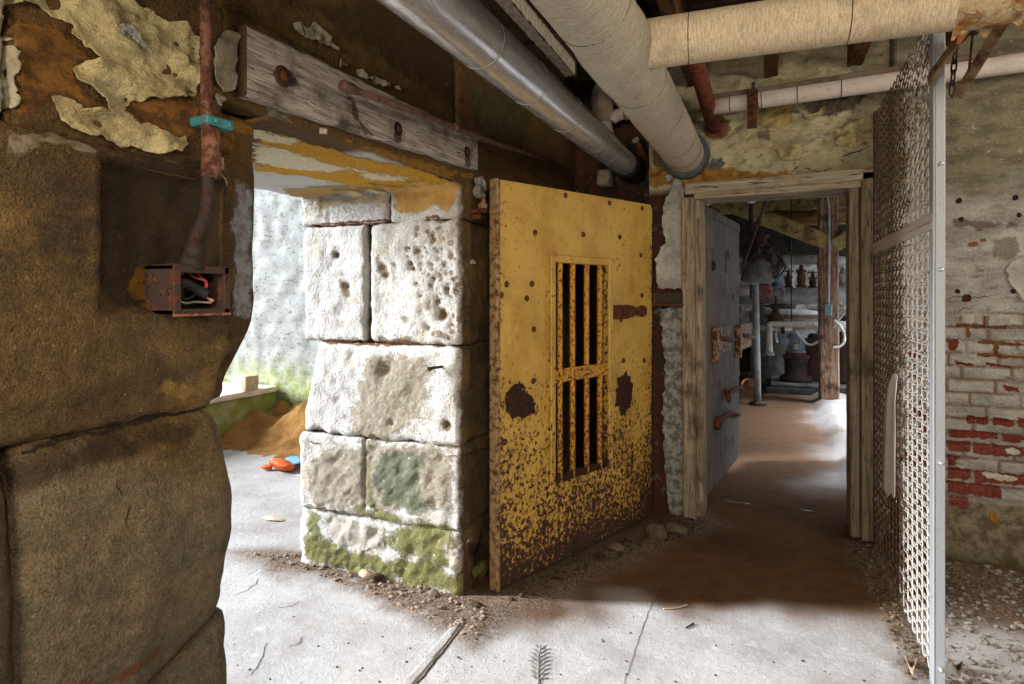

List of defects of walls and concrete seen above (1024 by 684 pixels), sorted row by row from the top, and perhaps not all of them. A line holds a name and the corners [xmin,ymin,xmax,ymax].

peeling [0,0,200,154]
peeling [214,21,487,199]
spalling [757,95,866,140]
spalling [706,158,725,171]
peeling [1006,256,1024,301]
spalling [947,311,1024,368]
rust [505,380,536,421]
rust [615,370,633,416]
crack [0,406,207,456]
rust [556,459,616,490]
peeling [946,415,1024,509]
water stain [440,538,472,571]